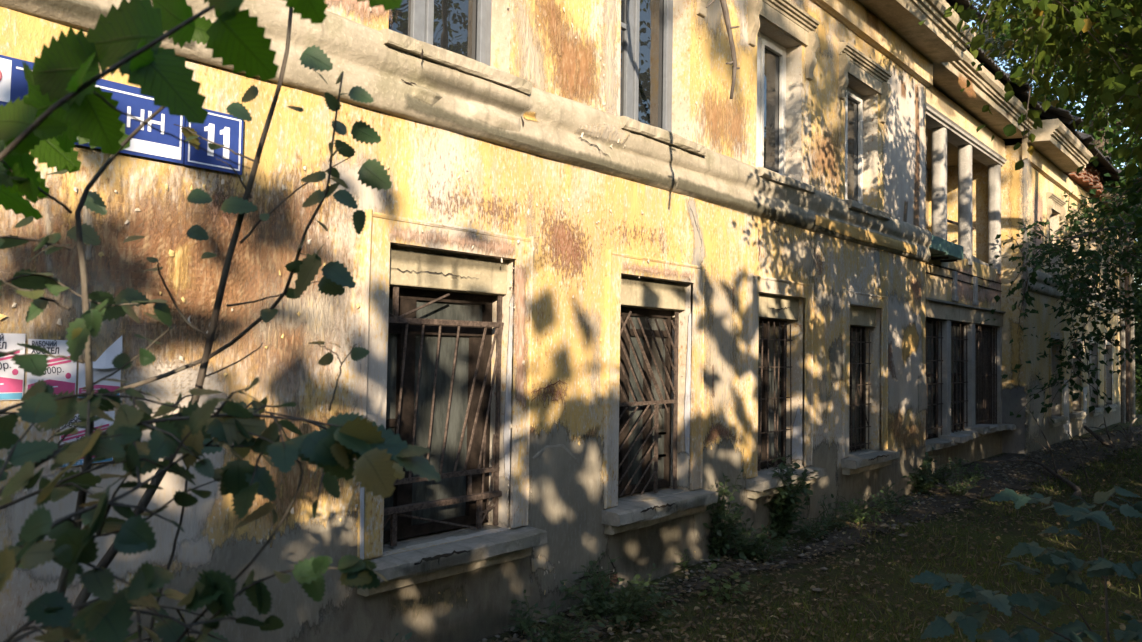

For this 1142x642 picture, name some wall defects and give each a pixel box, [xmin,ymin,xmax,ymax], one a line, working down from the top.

leakage [407,96,847,236]
peeling [0,154,393,642]
peeling [389,168,746,597]
peeling [817,333,843,428]
peeling [869,276,924,460]